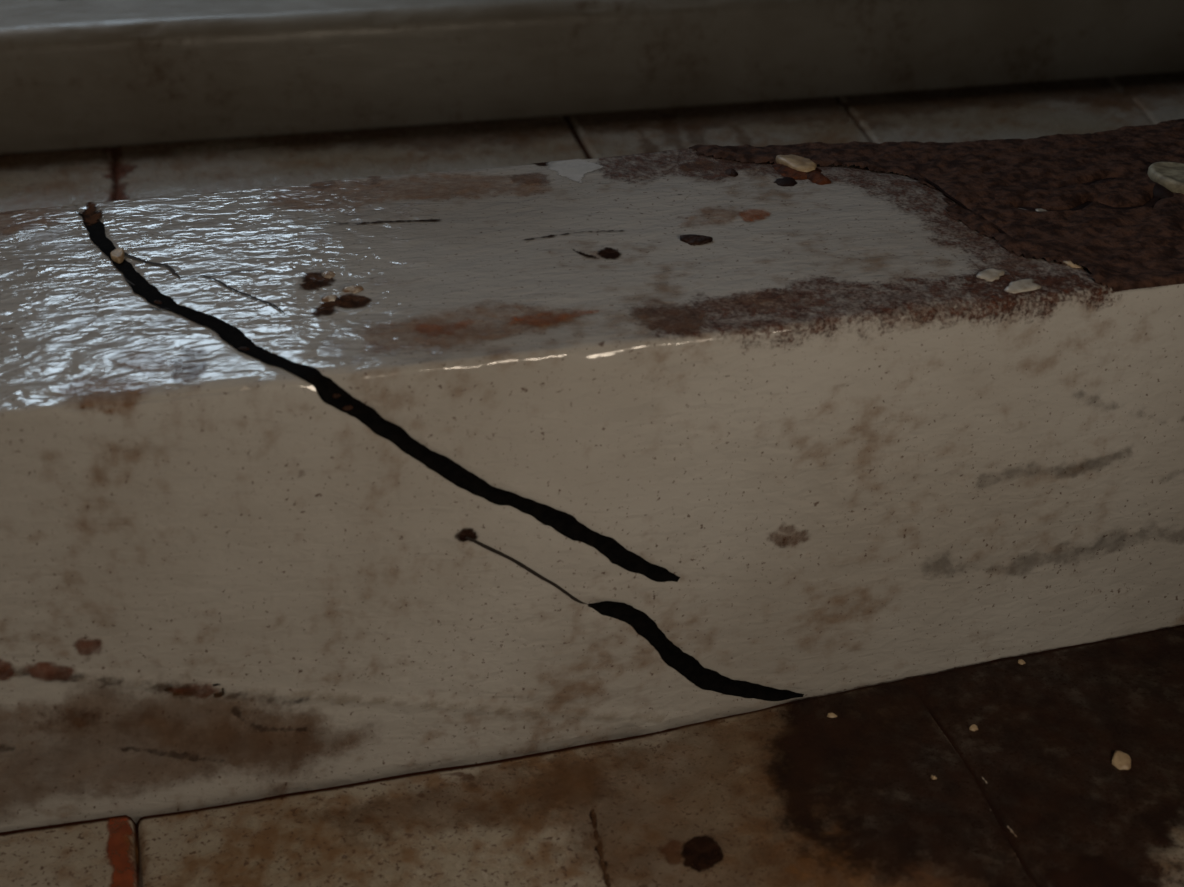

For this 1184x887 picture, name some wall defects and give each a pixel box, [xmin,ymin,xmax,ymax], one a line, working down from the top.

spalling [641,119,1184,346]
crack [74,202,680,582]
crack [465,536,804,701]
rust [107,817,137,887]
leakage [768,625,1184,887]